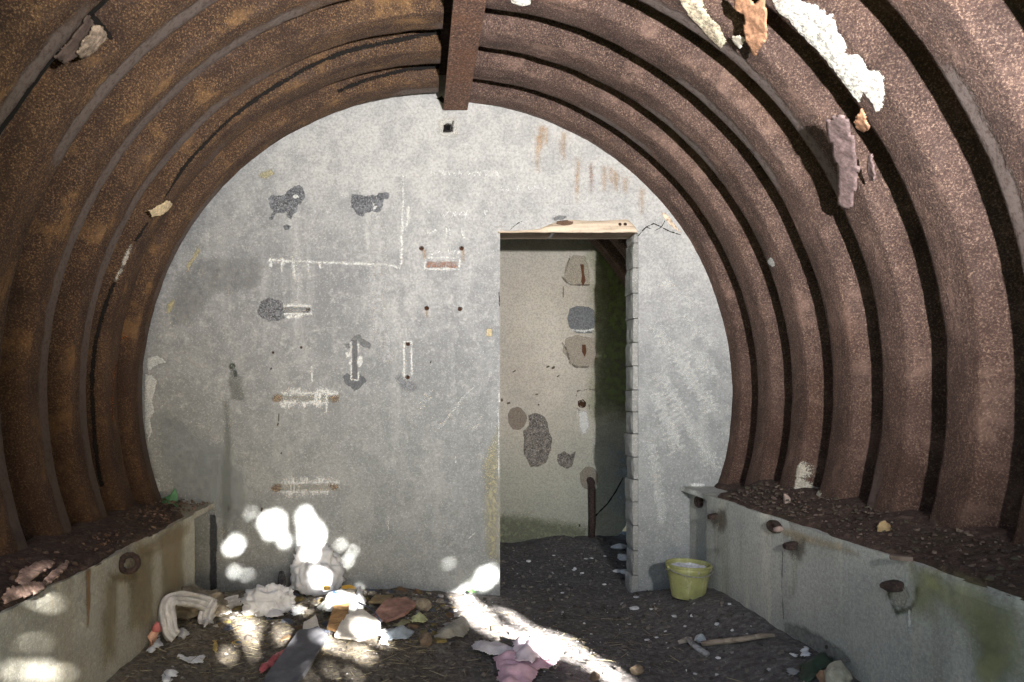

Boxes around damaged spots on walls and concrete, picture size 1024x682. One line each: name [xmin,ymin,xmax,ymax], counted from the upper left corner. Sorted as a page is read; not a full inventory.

peeling [772,0,885,112]
spalling [268,185,305,230]
spalling [351,192,390,216]
crack [638,221,681,236]
spalling [257,298,312,321]
spalling [523,413,576,469]